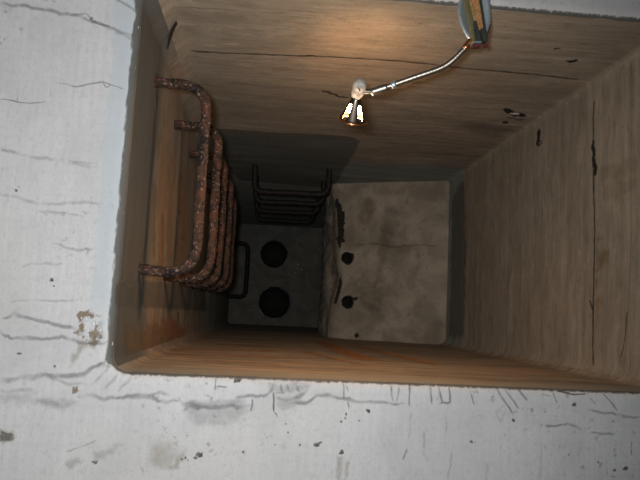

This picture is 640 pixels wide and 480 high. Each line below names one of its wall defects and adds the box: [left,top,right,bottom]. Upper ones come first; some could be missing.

crack [195,51,576,80]
crack [589,102,597,364]